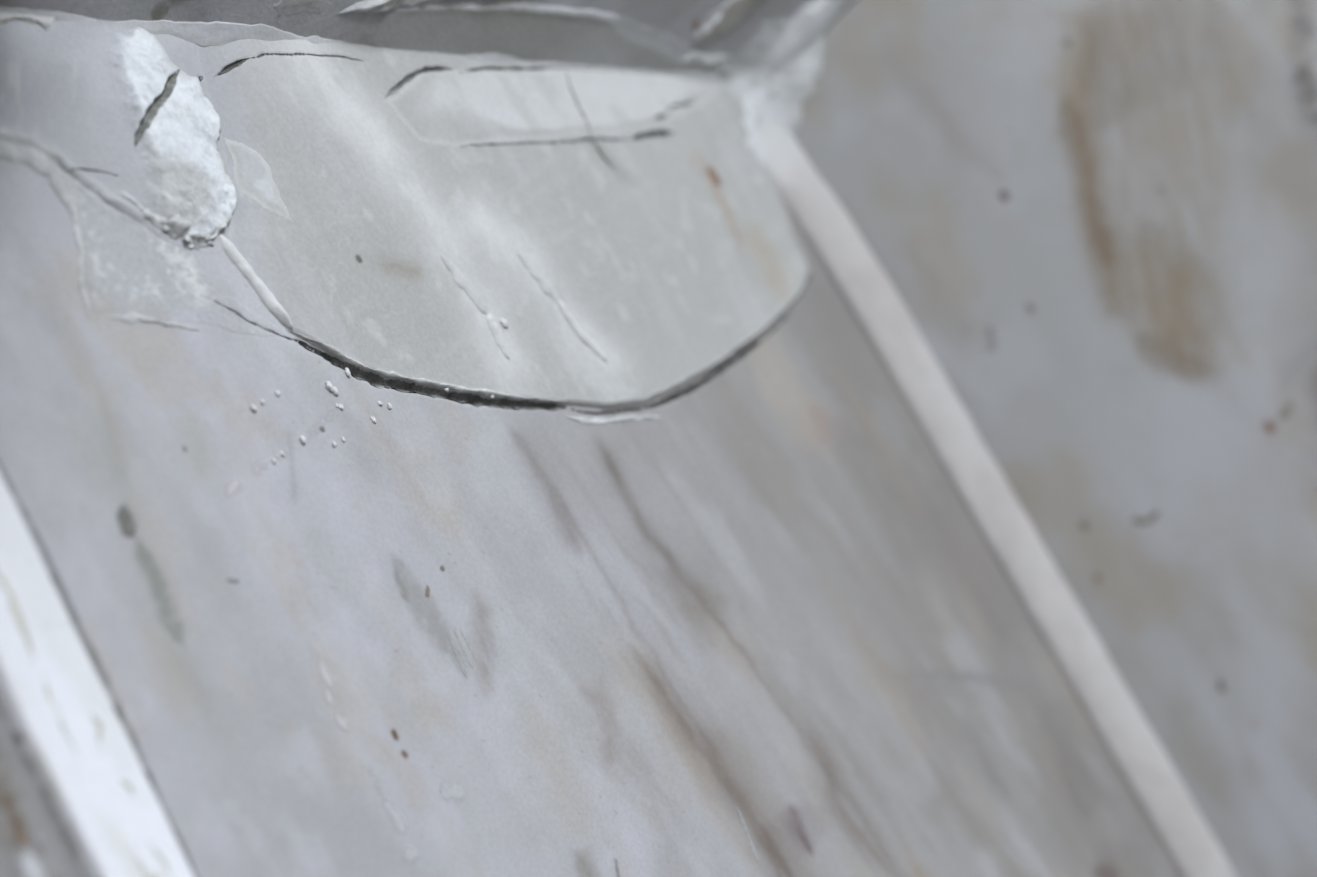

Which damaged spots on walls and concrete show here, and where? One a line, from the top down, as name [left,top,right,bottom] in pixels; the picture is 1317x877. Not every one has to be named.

flaking render [337,0,442,15]
flaking render [102,27,294,250]
crack [134,53,364,146]
crack [387,66,698,169]
crack [214,300,793,414]